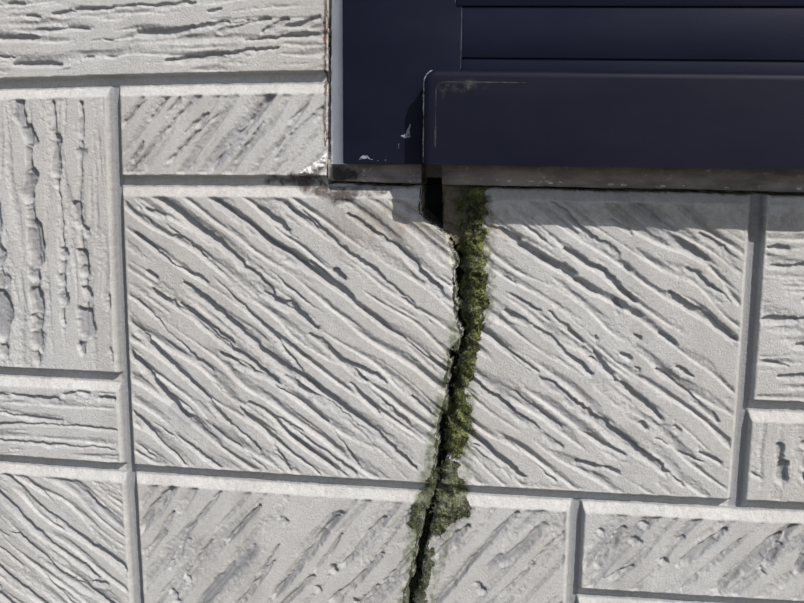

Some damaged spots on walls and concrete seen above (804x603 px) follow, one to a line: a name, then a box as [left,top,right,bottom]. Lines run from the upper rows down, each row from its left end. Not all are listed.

crack [403,177,491,603]